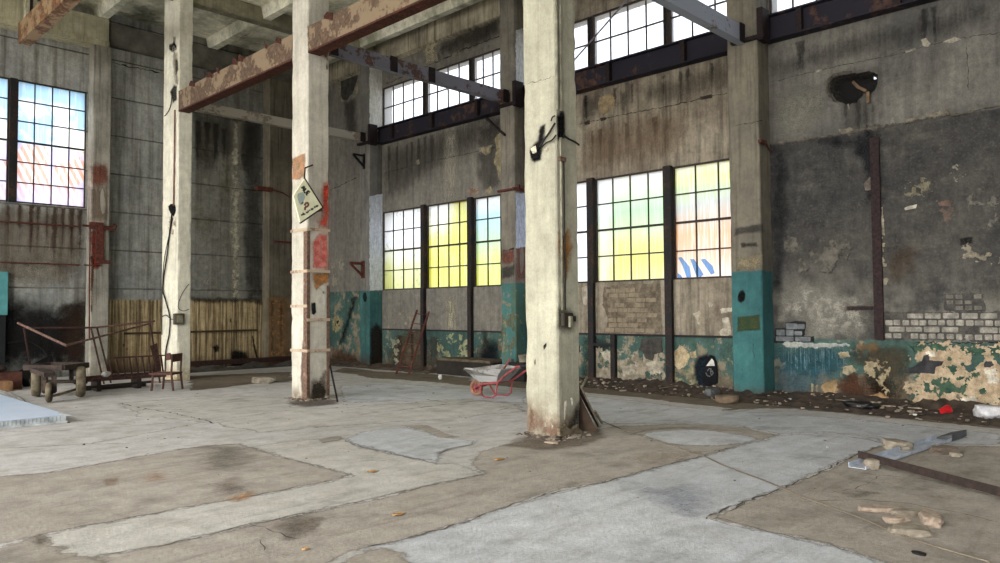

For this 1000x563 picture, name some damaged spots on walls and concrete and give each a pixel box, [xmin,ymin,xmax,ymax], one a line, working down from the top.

spalling [826,64,879,112]
leakage [831,130,878,200]
leakage [7,190,107,253]
leakage [196,115,289,358]
peeling [904,177,954,223]
peeling [961,243,1000,264]
leakage [784,290,860,331]
peeling [385,311,412,365]
peeling [437,333,475,357]
peeling [596,345,697,385]
peeling [884,293,1000,406]